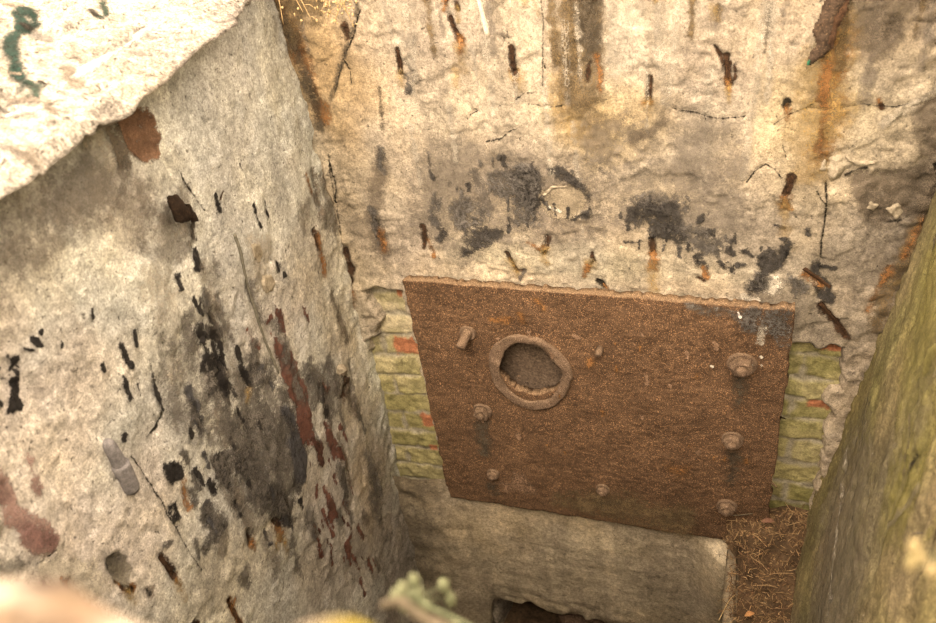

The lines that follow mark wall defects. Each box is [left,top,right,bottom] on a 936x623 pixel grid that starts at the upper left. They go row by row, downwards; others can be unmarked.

corrosion [274,0,358,133]
corrosion [556,0,605,113]
corrosion [713,44,737,92]
corrosion [815,12,859,165]
leakage [0,137,267,437]
corrosion [311,227,327,276]
leakage [428,154,592,257]
leakage [619,190,809,302]
crack [816,180,828,257]
leakage [163,460,193,523]
leakage [206,477,218,497]
leakage [280,404,308,485]